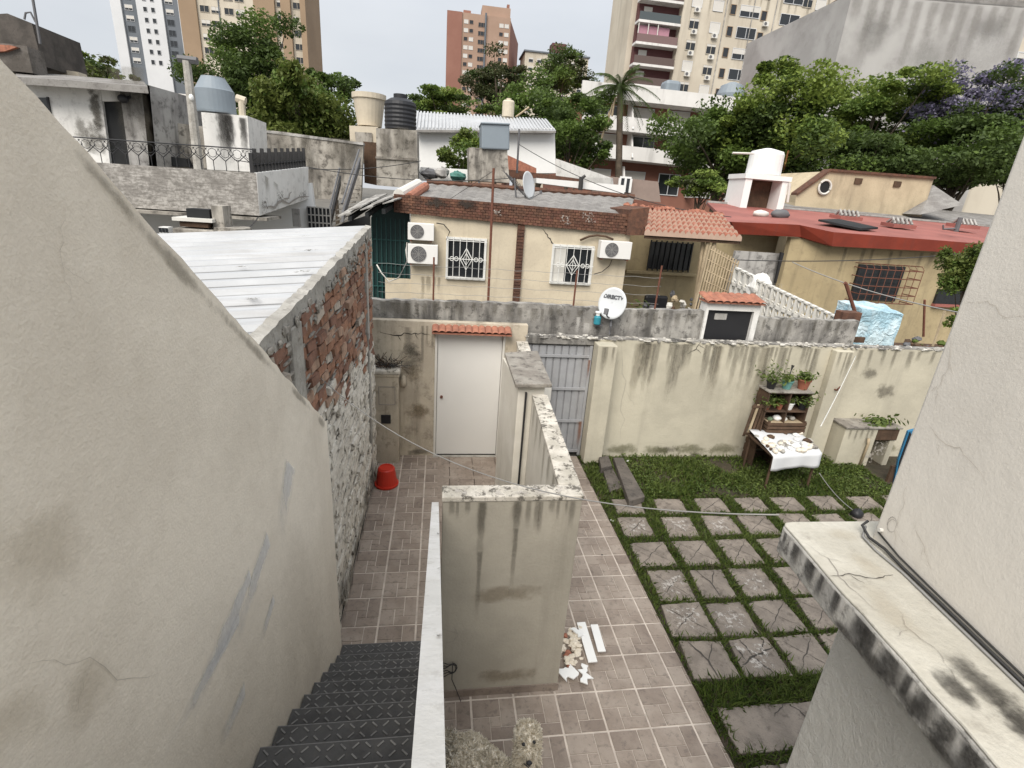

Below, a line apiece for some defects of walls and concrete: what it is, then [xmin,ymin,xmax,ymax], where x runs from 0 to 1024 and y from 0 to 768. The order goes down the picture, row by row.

flaking render [250,225,371,364]
crack [620,486,931,677]
leakage [781,532,824,590]
leakage [831,591,933,718]
leakage [926,716,986,768]
leakage [942,664,1024,734]